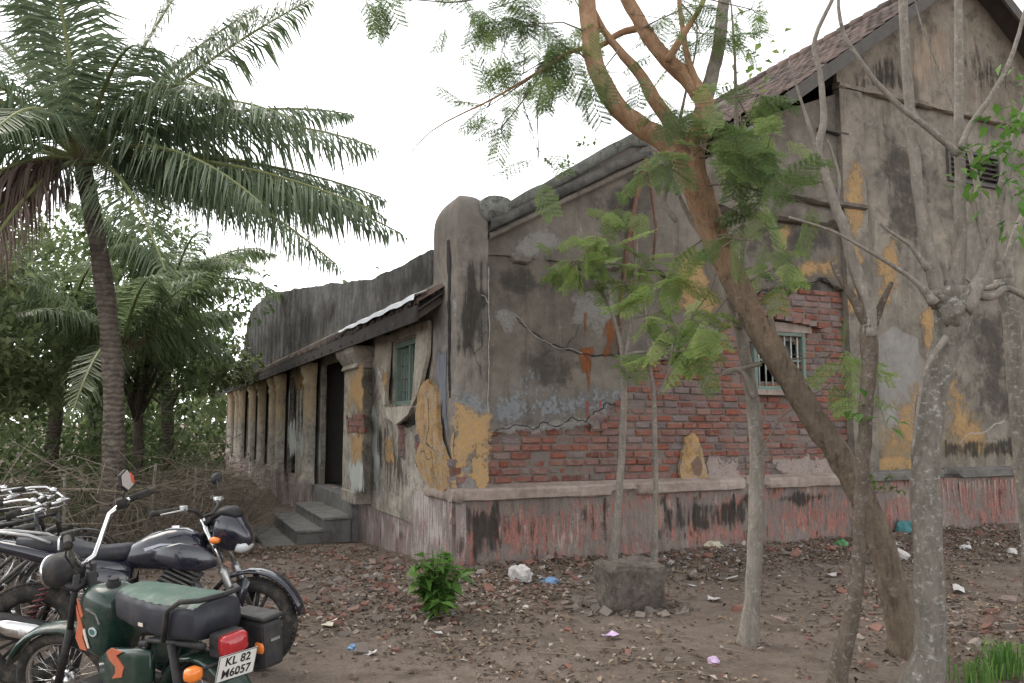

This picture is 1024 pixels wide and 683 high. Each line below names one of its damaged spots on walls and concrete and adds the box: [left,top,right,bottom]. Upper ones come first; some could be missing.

water stain [856,59,902,89]
peeling [846,162,864,264]
peeling [346,363,367,472]
water stain [437,263,621,433]
crack [447,239,620,415]
spalling [446,254,758,489]
spalling [758,379,826,475]
spalling [757,260,858,444]
peeling [941,373,1007,458]
water stain [945,438,1013,458]
water stain [466,502,505,560]
water stain [659,494,748,537]